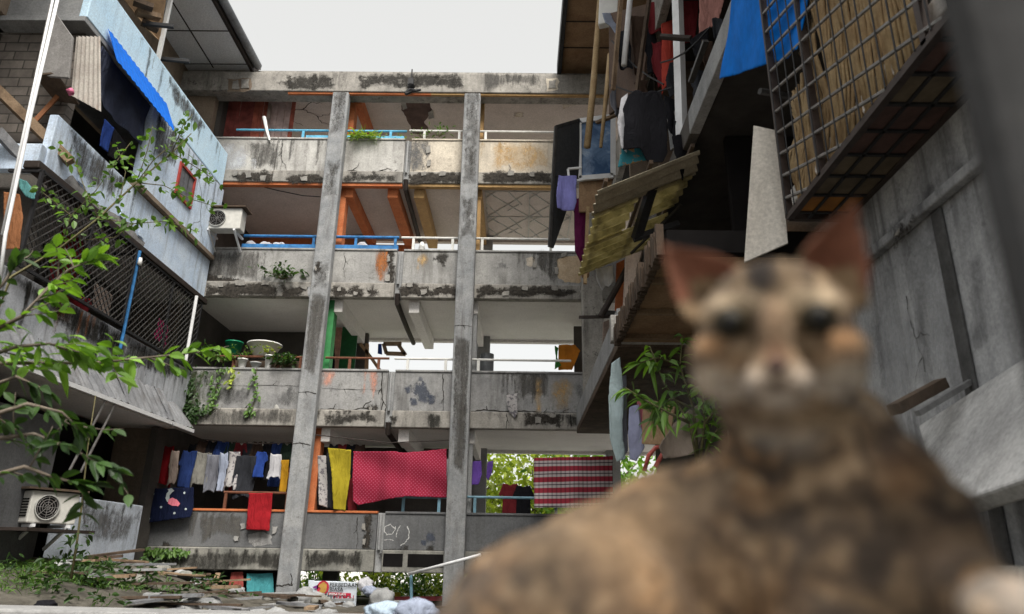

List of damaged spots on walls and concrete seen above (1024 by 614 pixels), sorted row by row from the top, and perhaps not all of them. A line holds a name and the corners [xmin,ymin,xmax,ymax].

crack [278,102,329,170]
peeling [401,103,462,185]
water stain [359,73,542,177]
water stain [328,164,395,188]
corrosion [376,251,388,279]
water stain [507,373,581,426]
water stain [305,551,360,568]